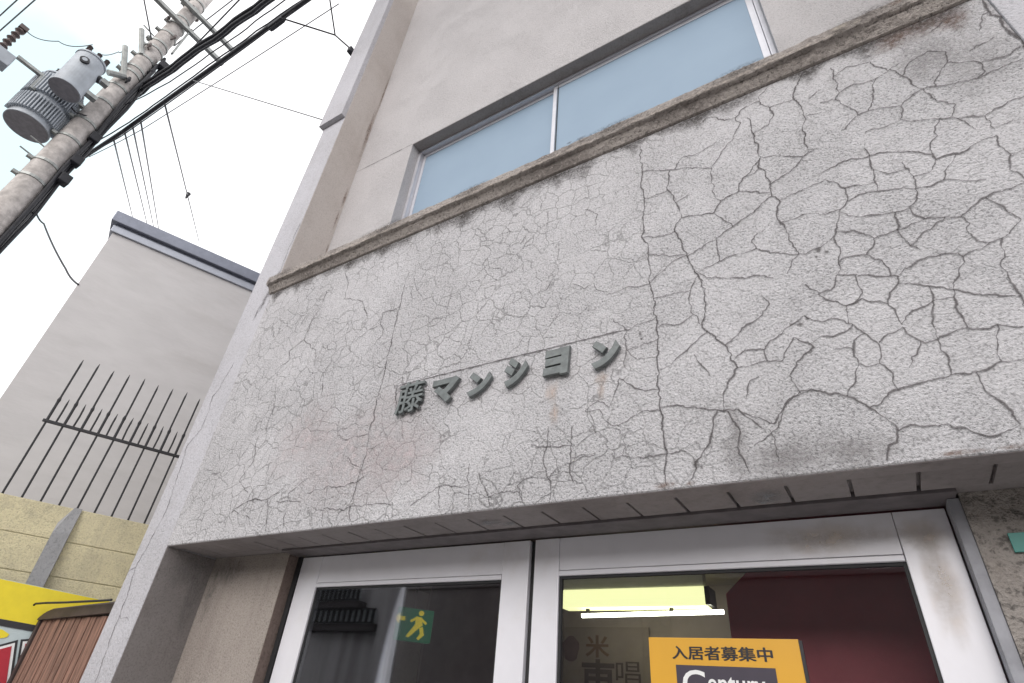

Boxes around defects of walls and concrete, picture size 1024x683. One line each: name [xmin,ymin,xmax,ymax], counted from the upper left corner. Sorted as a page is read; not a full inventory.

crack [232,0,1024,531]